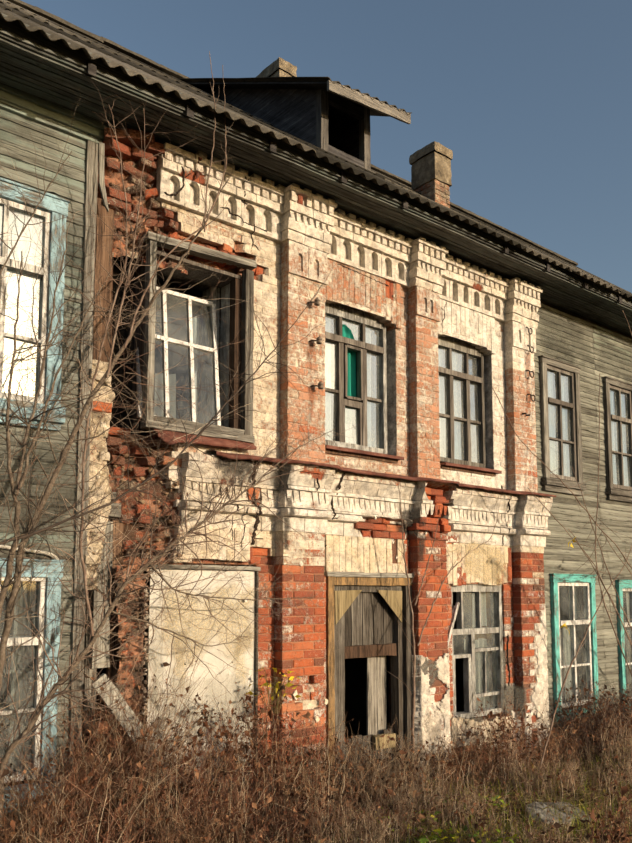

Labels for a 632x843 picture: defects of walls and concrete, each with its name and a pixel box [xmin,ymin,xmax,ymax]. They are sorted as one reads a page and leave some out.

spalling [97,127,264,280]
crack [164,157,207,196]
crack [220,176,267,251]
spalling [84,360,225,590]
crack [229,461,263,549]
crack [312,473,348,520]
peeling [237,547,328,767]
peeling [354,487,550,771]